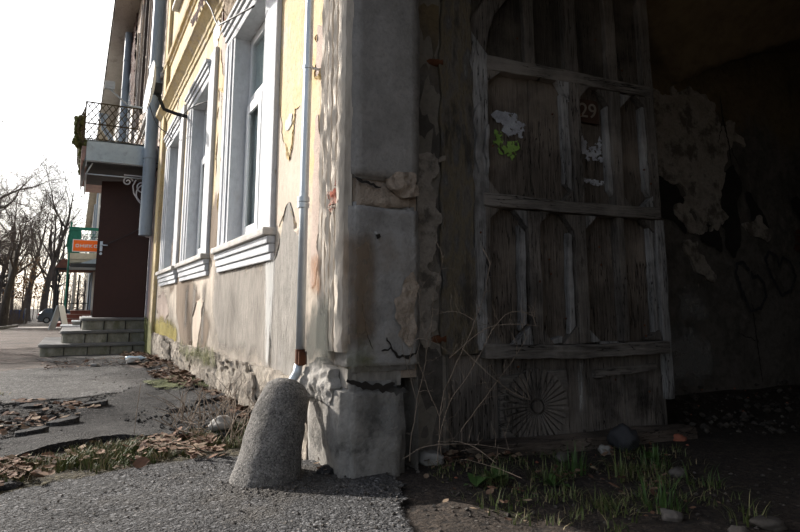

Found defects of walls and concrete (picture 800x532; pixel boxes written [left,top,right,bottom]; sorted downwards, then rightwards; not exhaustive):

spalling [213,0,237,74]
peeling [314,25,323,80]
peeling [215,87,224,210]
peeling [275,101,303,236]
peeling [310,114,338,288]
peeling [385,152,446,348]
peeling [653,86,746,283]
flaking render [158,298,257,414]
crack [346,379,410,396]
crack [367,336,418,359]